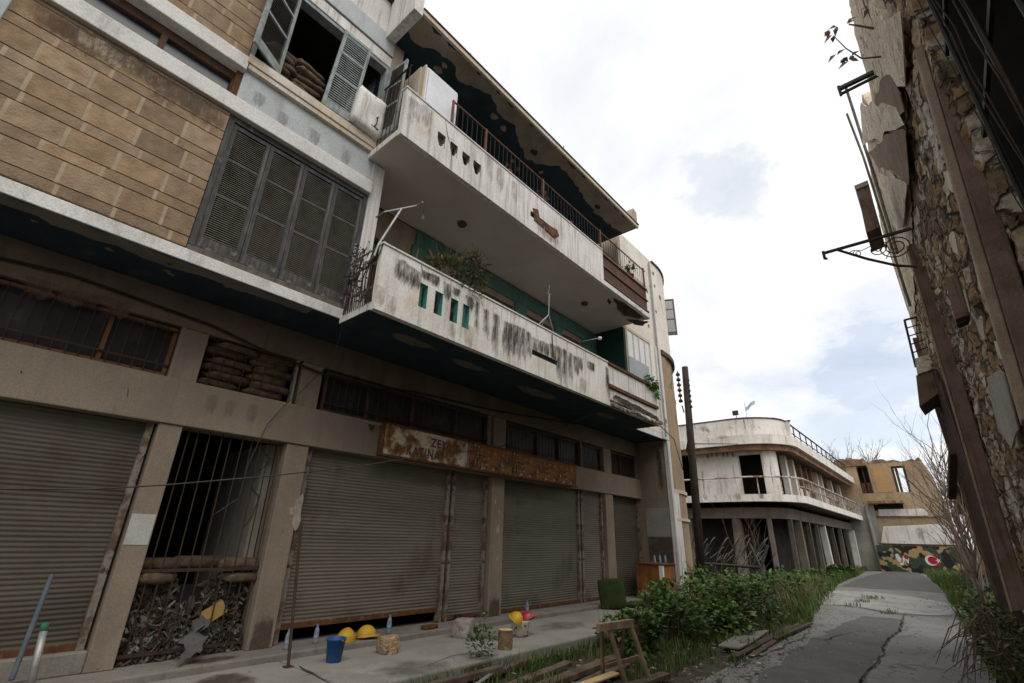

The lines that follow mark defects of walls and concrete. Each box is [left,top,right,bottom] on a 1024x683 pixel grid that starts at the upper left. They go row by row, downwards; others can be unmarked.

peeling [875,75,905,115]
peeling [408,16,634,233]
peeling [869,129,910,185]
peeling [943,170,954,193]
spalling [533,208,559,240]
peeling [949,232,960,255]
leakage [393,260,610,394]
peeling [963,289,1002,359]
crack [738,605,933,683]